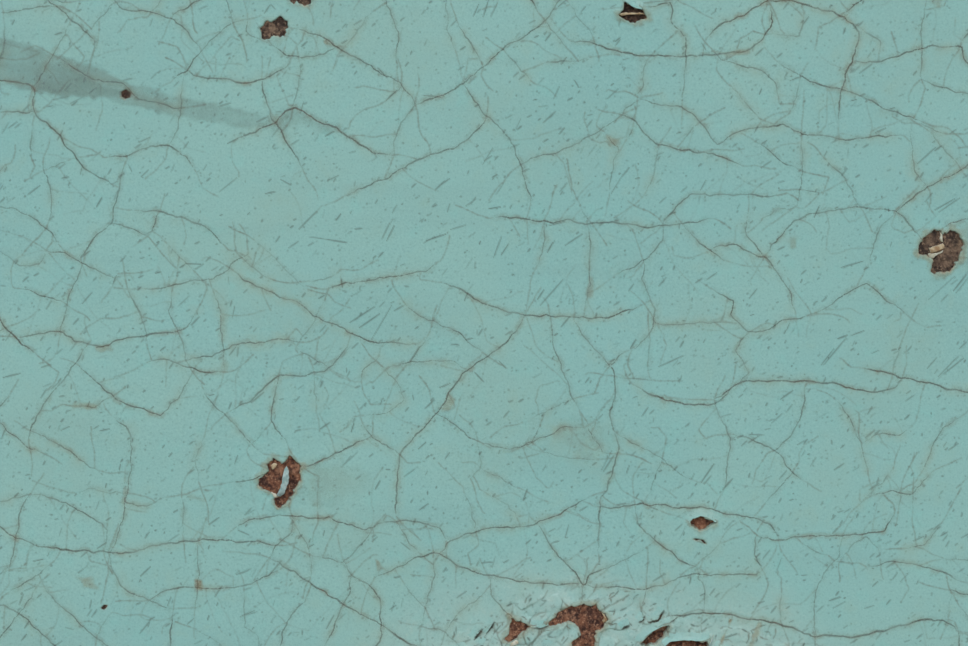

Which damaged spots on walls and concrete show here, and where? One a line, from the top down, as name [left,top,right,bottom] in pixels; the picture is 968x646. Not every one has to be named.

crack [139,0,379,154]
crack [583,2,684,57]
crack [714,0,932,107]
crack [0,54,103,179]
crack [0,319,75,348]
crack [87,373,168,427]
crack [421,356,488,431]
crack [650,369,968,406]
crack [615,502,776,541]
crack [466,546,595,585]
peeling [617,606,664,629]
crack [676,612,883,638]